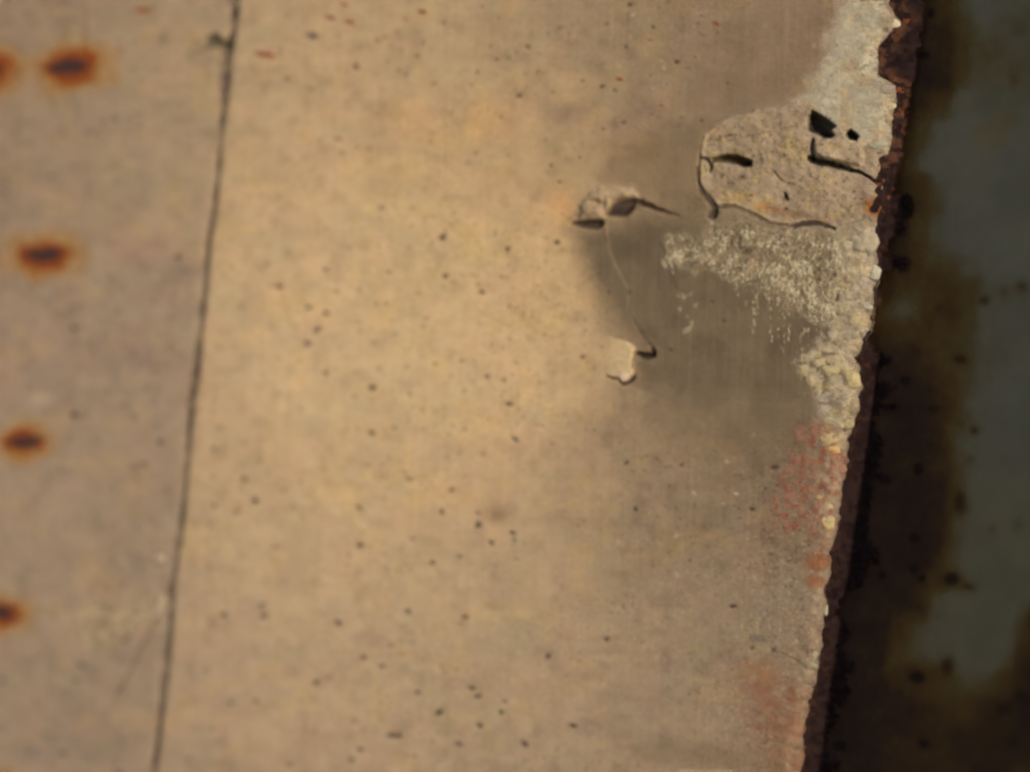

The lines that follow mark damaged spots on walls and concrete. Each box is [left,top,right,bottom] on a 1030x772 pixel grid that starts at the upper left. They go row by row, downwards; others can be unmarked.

rust [0,52,22,92]
rust [41,46,101,90]
rust [15,238,77,276]
spalling [667,0,901,538]
damp [580,218,877,447]
peeling [607,341,656,386]
rust [825,0,1030,772]
rust [1,425,47,461]
rust [770,425,845,533]
rust [0,599,25,632]